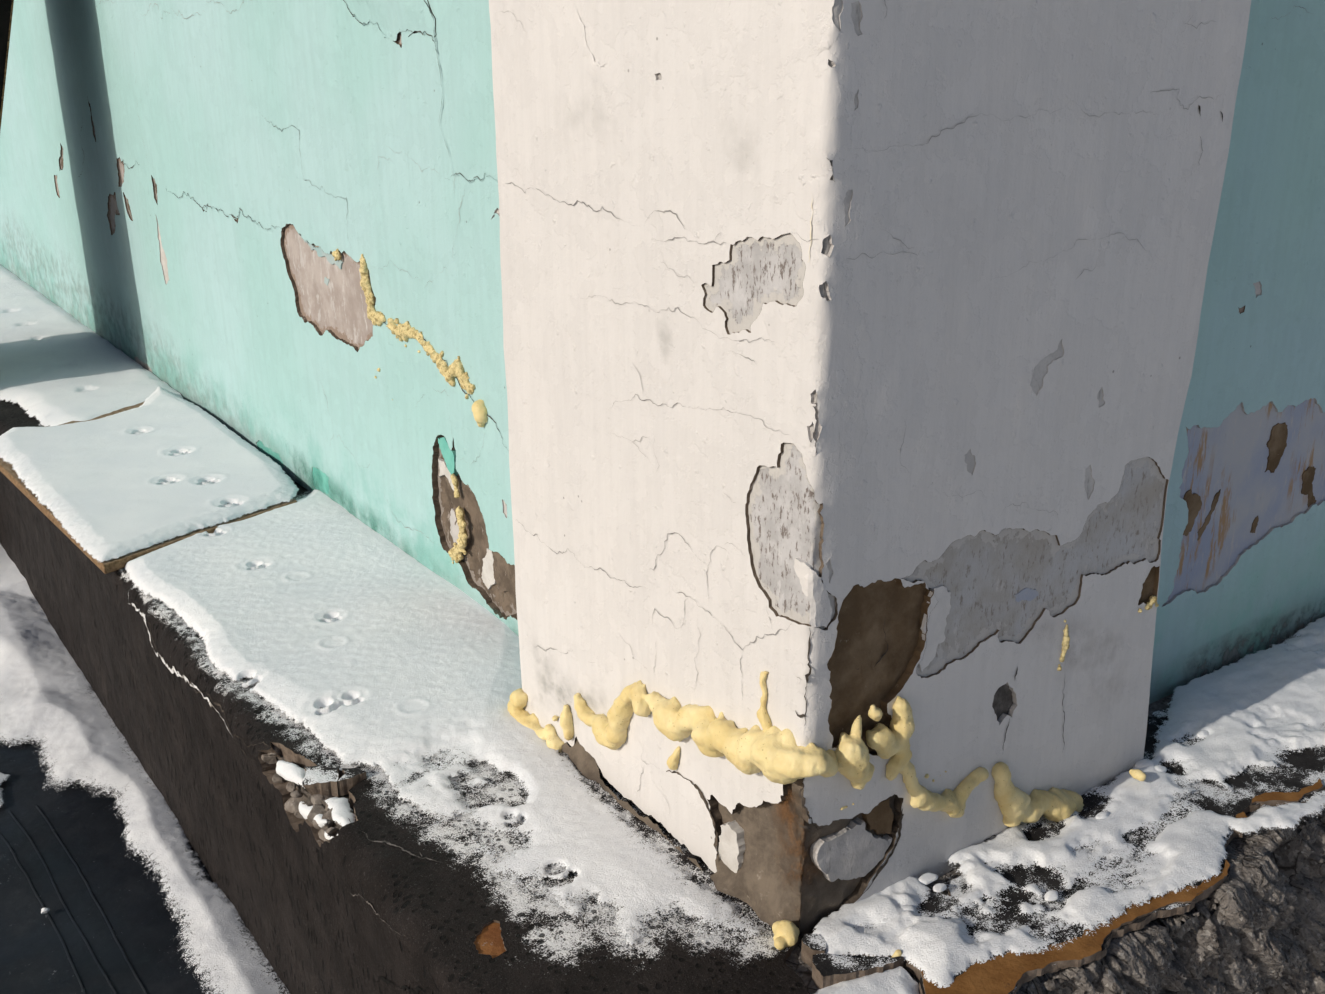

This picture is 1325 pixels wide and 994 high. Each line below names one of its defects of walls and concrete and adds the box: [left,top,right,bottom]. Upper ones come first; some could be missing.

peeling [54,143,63,198]
peeling [107,157,133,235]
crack [342,0,779,362]
spalling [280,224,376,352]
peeling [701,233,831,334]
crack [417,339,503,462]
crack [128,595,268,761]
spalling [432,435,517,620]
crack [519,522,811,726]
peeling [745,389,1325,756]
spalling [258,741,364,847]
spalling [561,737,904,939]